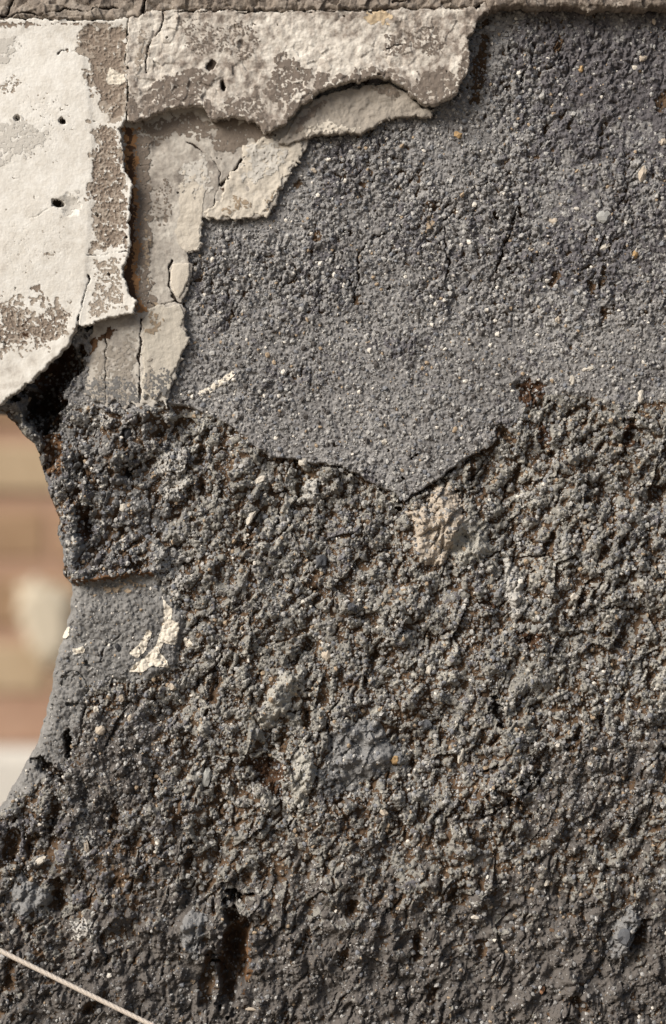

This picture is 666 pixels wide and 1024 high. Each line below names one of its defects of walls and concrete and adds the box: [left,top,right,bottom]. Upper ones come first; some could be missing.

flaking render [0,2,489,318]
spalling [0,263,666,1024]